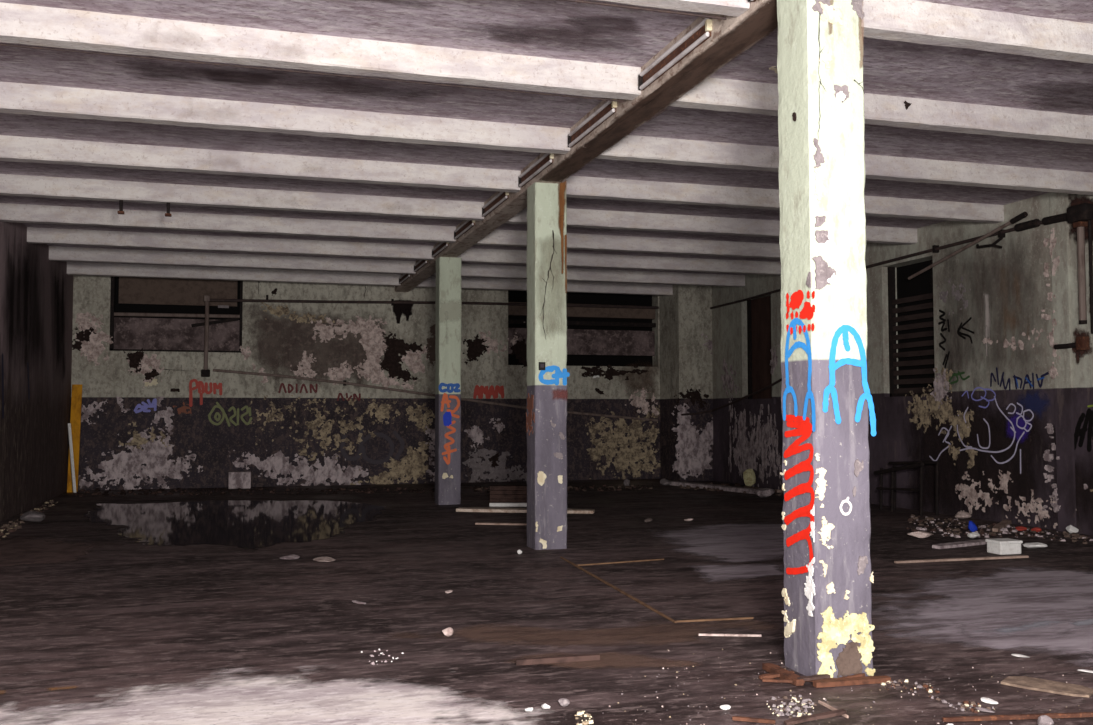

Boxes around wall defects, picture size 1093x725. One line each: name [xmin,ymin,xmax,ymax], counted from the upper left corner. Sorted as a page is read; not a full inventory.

damp [493,19,631,45]
peeling [851,0,865,20]
corrosion [540,0,778,293]
damp [7,261,43,355]
spalling [806,256,836,290]
spalling [815,216,829,243]
peeling [228,288,563,486]
peeling [581,365,713,479]
peeling [728,401,787,491]
peeling [905,367,1061,528]
peeling [804,453,875,678]
flaking render [782,588,796,638]